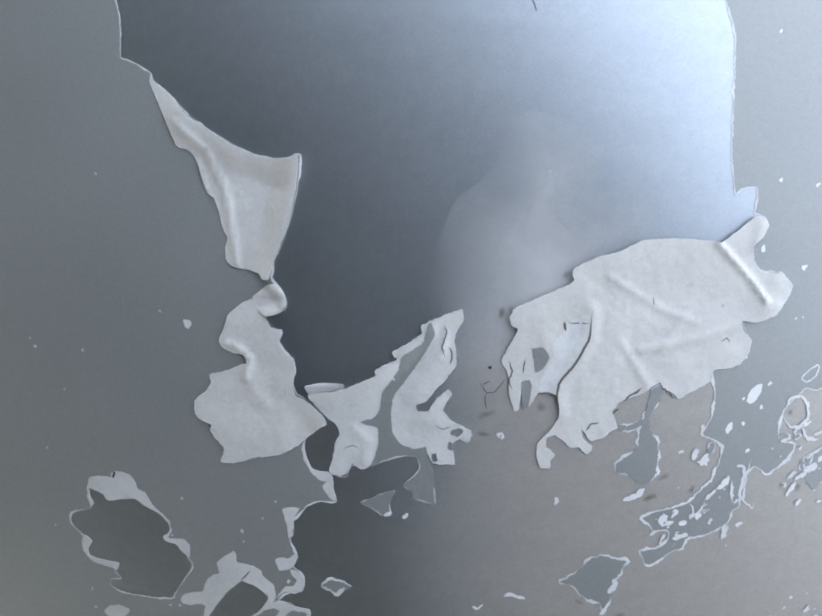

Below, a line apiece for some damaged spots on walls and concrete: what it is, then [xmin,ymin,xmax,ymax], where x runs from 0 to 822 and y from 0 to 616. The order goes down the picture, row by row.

peeling [114,0,793,504]
peeling [69,471,193,606]
peeling [181,340,822,616]